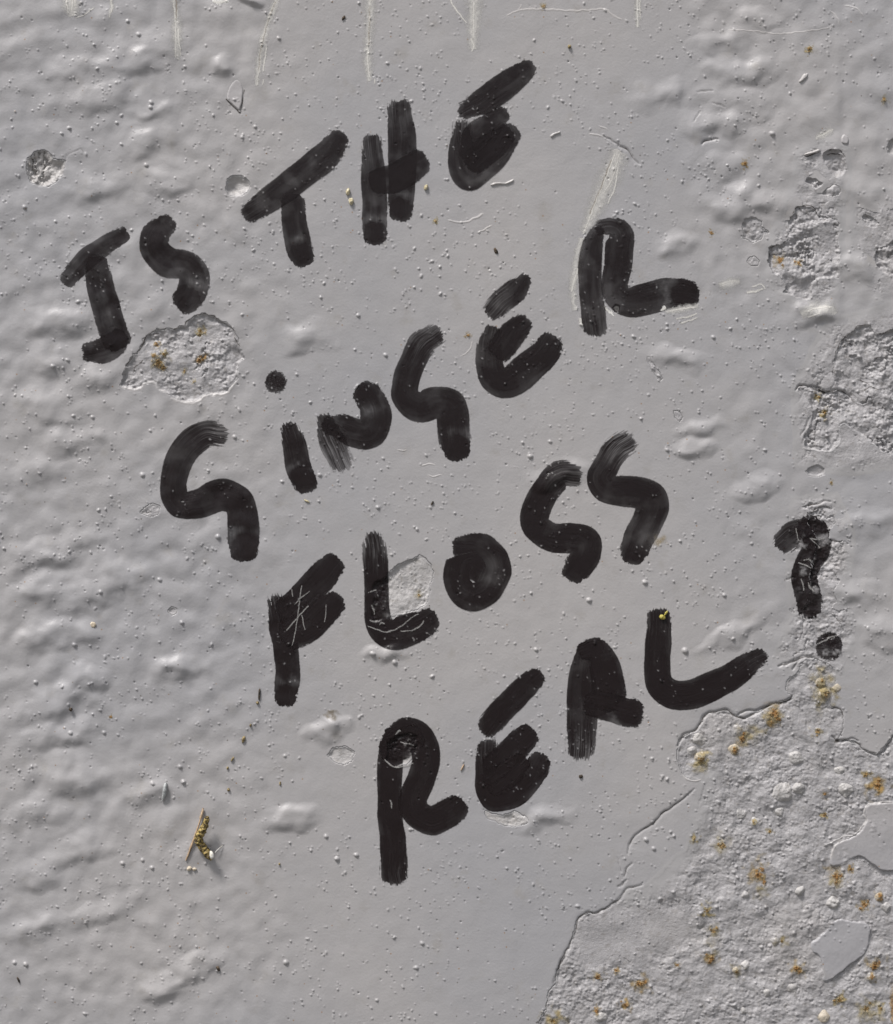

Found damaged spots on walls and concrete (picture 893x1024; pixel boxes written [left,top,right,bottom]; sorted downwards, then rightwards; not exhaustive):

peeling [26,150,66,187]
peeling [741,134,893,477]
peeling [120,313,245,401]
peeling [377,554,434,618]
peeling [538,492,893,1024]